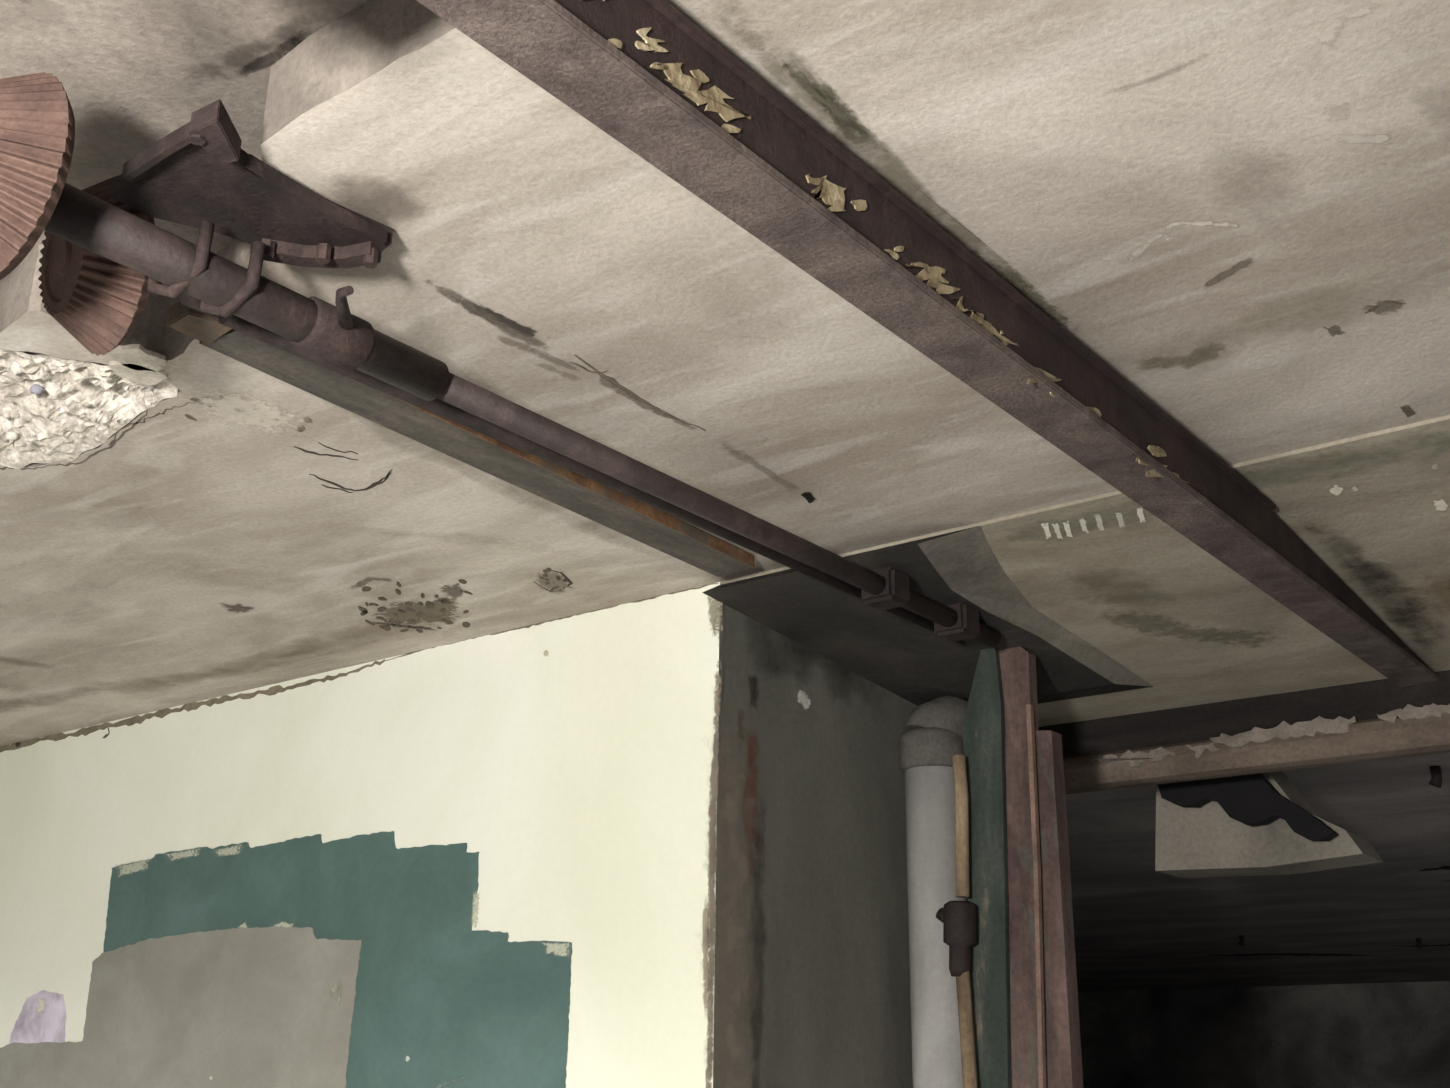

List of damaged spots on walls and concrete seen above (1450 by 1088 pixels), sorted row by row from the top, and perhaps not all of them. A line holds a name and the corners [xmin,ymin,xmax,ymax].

spalling [0,344,313,469]
crack [569,355,706,431]
peeling [1094,716,1356,767]
peeling [1377,703,1450,723]